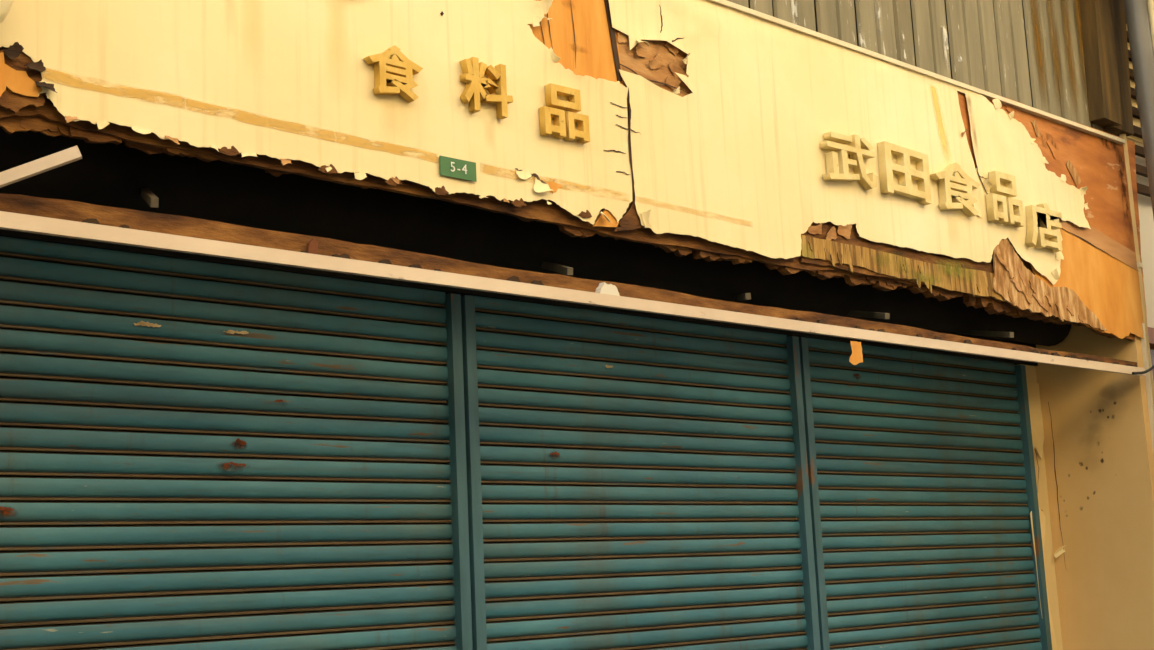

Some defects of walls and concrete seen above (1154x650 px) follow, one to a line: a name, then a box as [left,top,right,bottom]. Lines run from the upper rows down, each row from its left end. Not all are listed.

peeling [3,42,57,93]
peeling [527,0,692,97]
spalling [131,126,152,134]
spalling [211,145,258,157]
spalling [318,164,337,174]
spalling [429,186,449,195]
crack [603,87,639,205]
peeling [807,223,852,240]
peeling [988,97,1148,339]
spalling [0,229,1038,366]